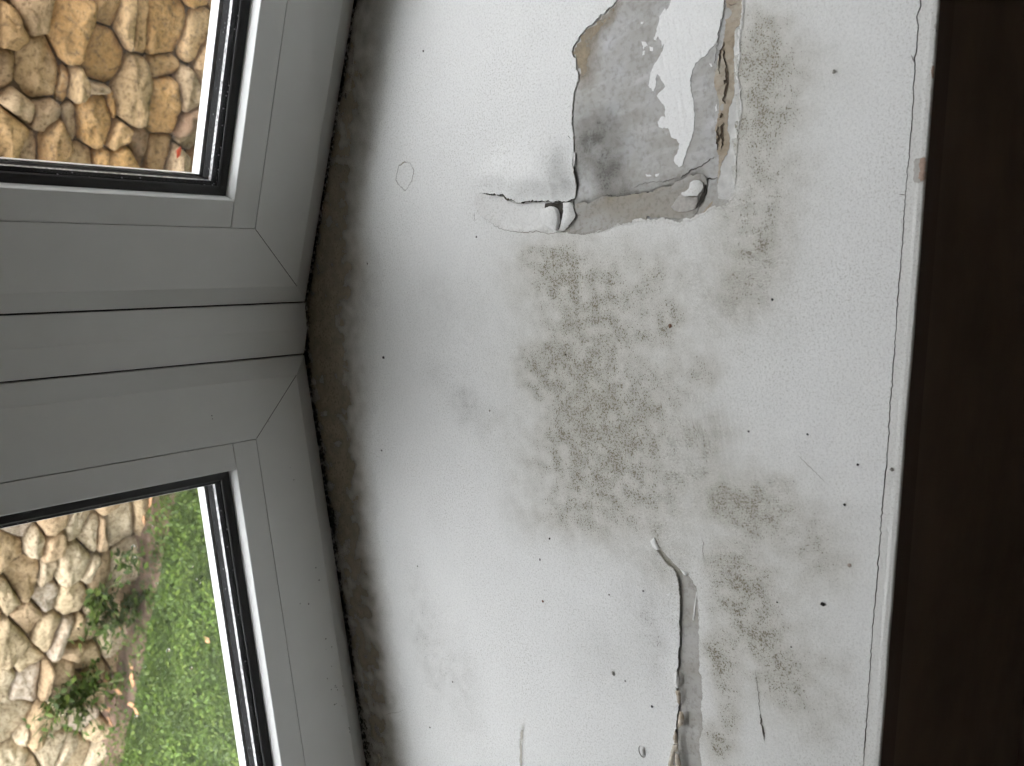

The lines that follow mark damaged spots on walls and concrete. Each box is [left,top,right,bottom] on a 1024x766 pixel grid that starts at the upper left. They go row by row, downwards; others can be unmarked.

peeling [538,0,744,235]
leakage [724,10,807,306]
leakage [302,0,391,766]
leakage [518,232,834,759]
peeling [650,538,703,766]